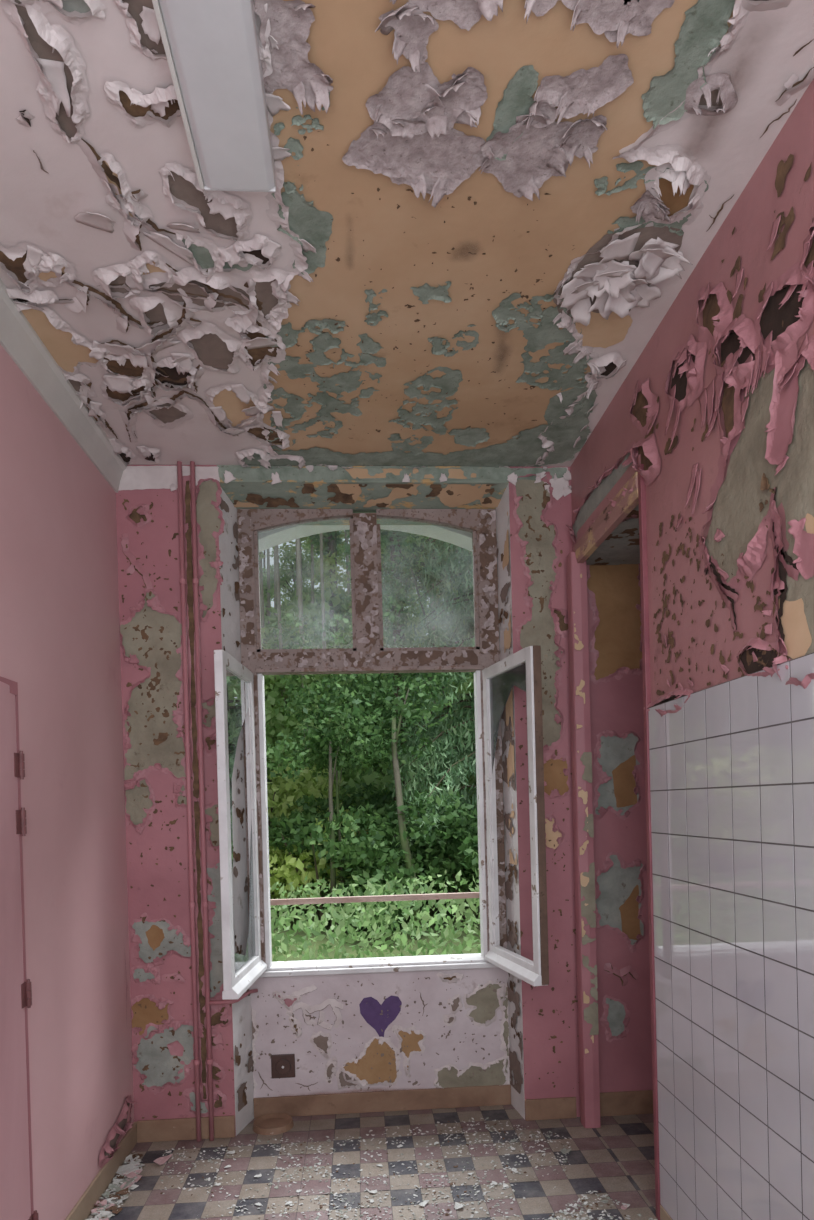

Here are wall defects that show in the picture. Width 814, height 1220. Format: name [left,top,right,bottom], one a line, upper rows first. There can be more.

peeling [766,154,794,261]
peeling [0,0,750,804]
peeling [566,218,814,717]
peeling [109,438,233,1117]
peeling [232,720,262,903]
peeling [484,690,530,953]
peeling [577,729,643,855]
peeling [233,1082,247,1112]
spalling [231,1007,272,1090]
spalling [247,985,428,1091]
peeling [413,972,533,1094]
peeling [536,851,647,1054]